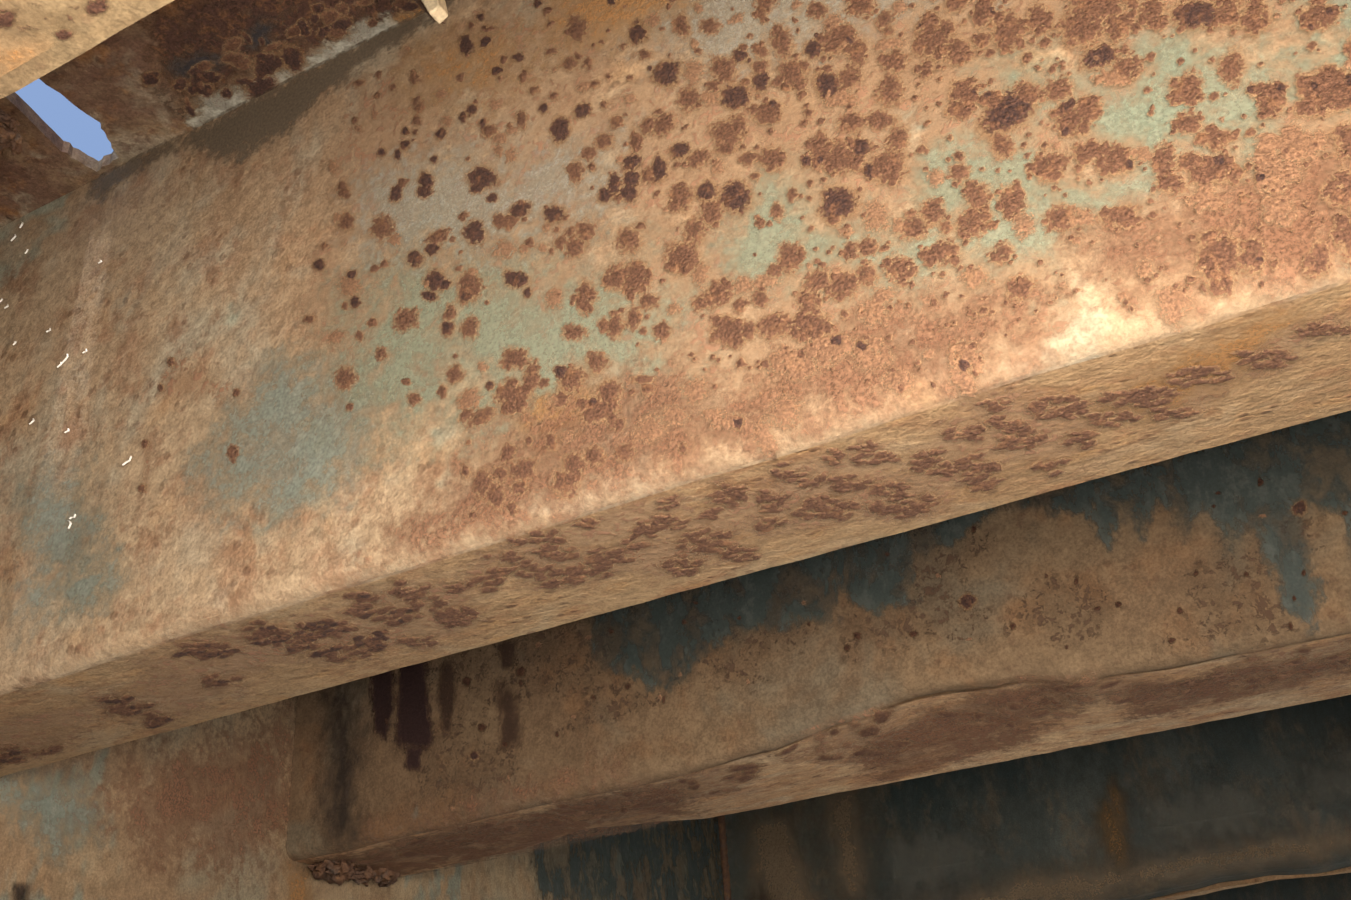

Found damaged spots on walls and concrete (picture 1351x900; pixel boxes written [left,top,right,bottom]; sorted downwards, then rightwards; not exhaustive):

corrosion [0,0,109,41]
corrosion [88,0,1351,729]
corrosion [0,710,96,768]
corrosion [349,514,1351,865]